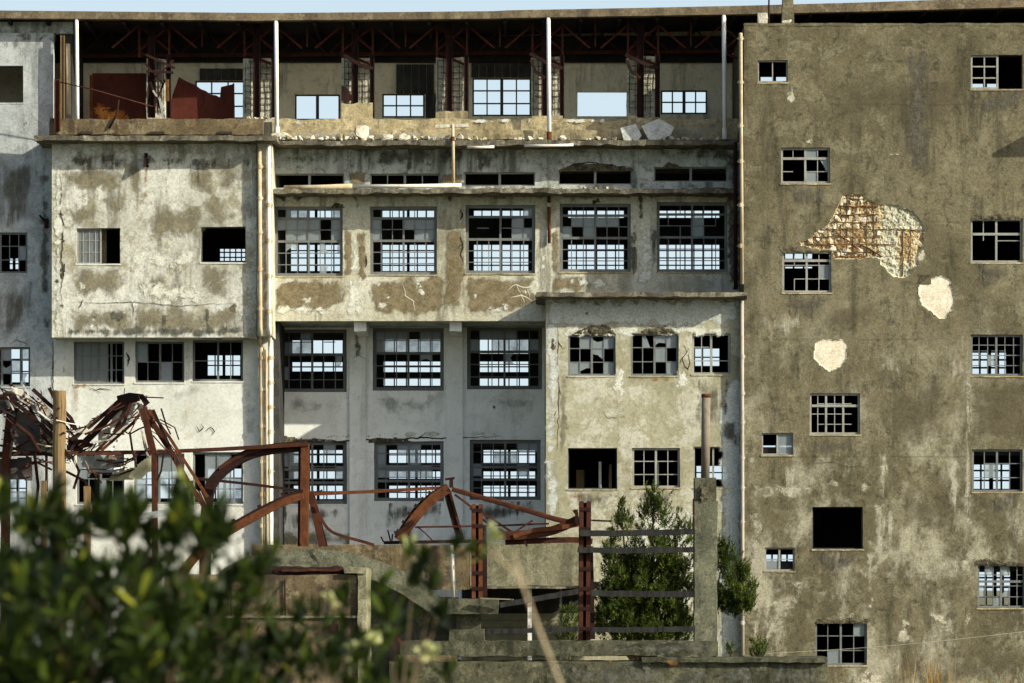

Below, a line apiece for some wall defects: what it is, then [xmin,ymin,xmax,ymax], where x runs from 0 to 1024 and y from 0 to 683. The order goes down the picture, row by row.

rust [95,104,129,120]
water stain [6,201,49,331]
crack [60,177,228,313]
water stain [69,309,239,337]
peeling [276,230,608,316]
crack [511,283,537,300]
peeling [814,339,848,371]
spalling [800,194,925,278]
peeling [919,276,954,319]
water stain [749,515,795,638]
water stain [815,505,893,577]
water stain [898,620,913,642]